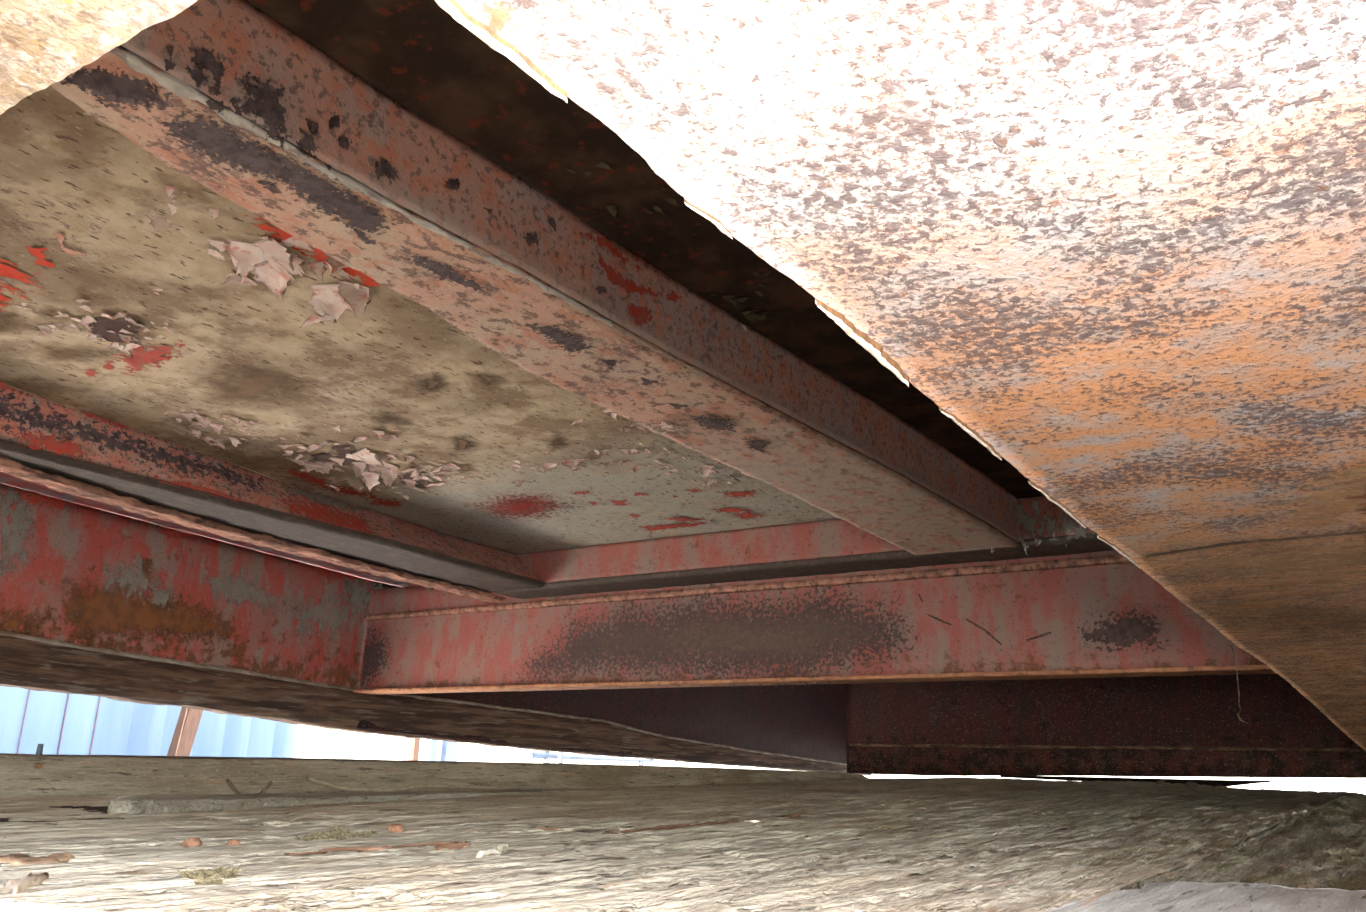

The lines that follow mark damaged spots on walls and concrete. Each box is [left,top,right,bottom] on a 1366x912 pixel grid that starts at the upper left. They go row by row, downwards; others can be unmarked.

corrosion [60,46,403,245]
peeling [147,185,179,232]
peeling [207,236,380,328]
corrosion [408,252,485,291]
water stain [44,346,106,362]
peeling [12,299,175,356]
corrosion [526,323,624,369]
water stain [216,369,297,405]
water stain [420,375,445,391]
corrosion [310,444,360,467]
peeling [164,409,751,511]
water stain [453,437,474,473]